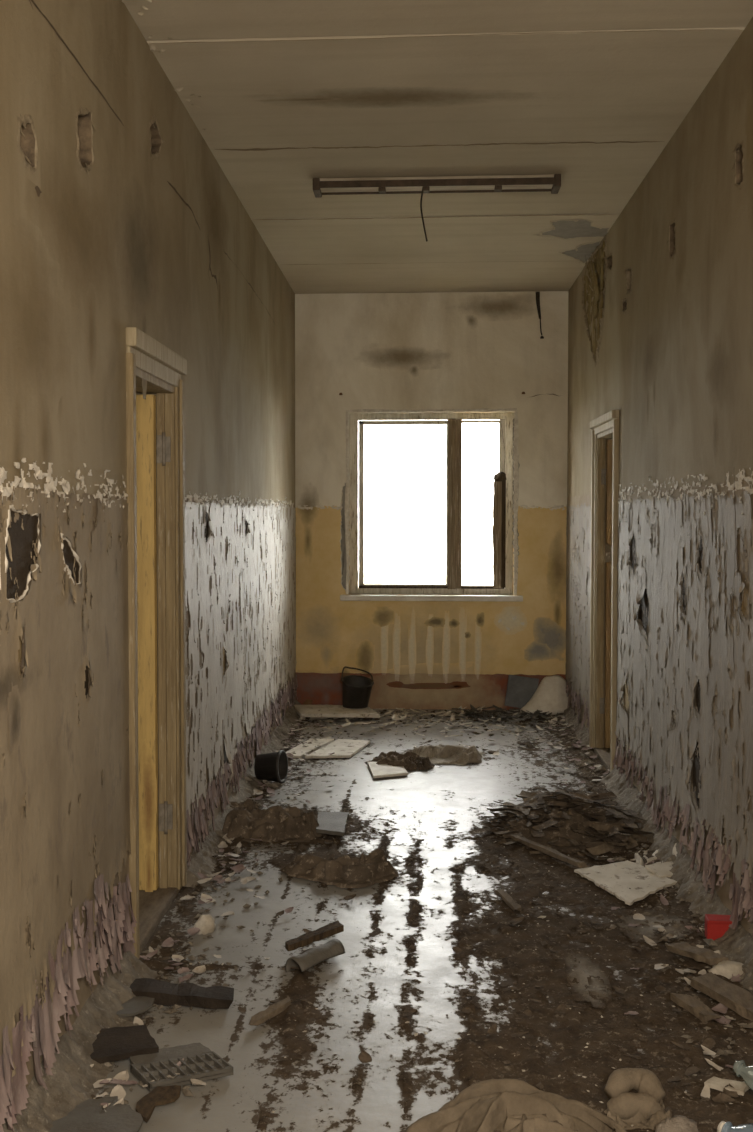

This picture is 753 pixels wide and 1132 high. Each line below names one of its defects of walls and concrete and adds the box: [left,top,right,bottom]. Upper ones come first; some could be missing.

hole [16,114,42,197]
hole [75,106,96,175]
leakage [215,86,576,110]
flaking render [533,219,613,367]
peeling [185,477,591,869]
leakage [296,602,514,710]
peeling [613,468,753,937]
peeling [0,458,137,1132]
peeling [358,1050,372,1063]